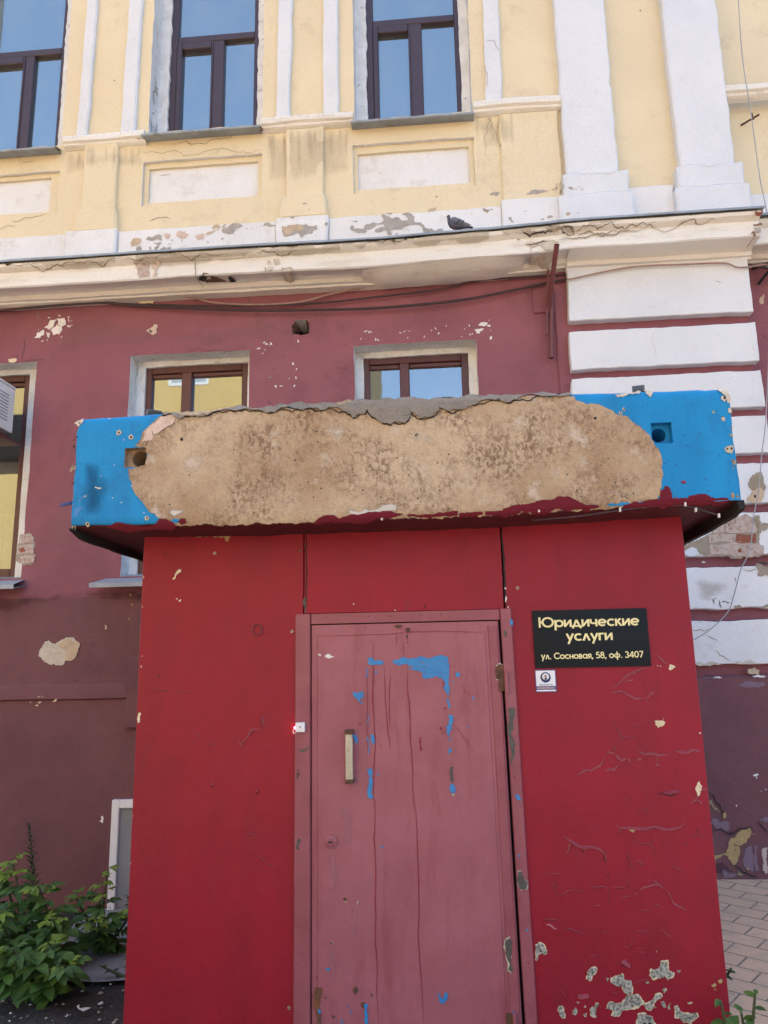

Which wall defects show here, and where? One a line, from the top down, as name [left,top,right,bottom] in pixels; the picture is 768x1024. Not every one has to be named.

peeling [130,216,328,283]
peeling [350,208,443,243]
crack [518,218,713,245]
flaking render [34,315,71,342]
peeling [116,389,676,541]
flaking render [684,472,768,577]
flaking render [39,636,81,666]
peeling [366,655,460,799]
crack [576,654,702,776]
peeling [695,781,768,878]
crack [543,788,767,1008]
flaking render [558,951,699,1024]